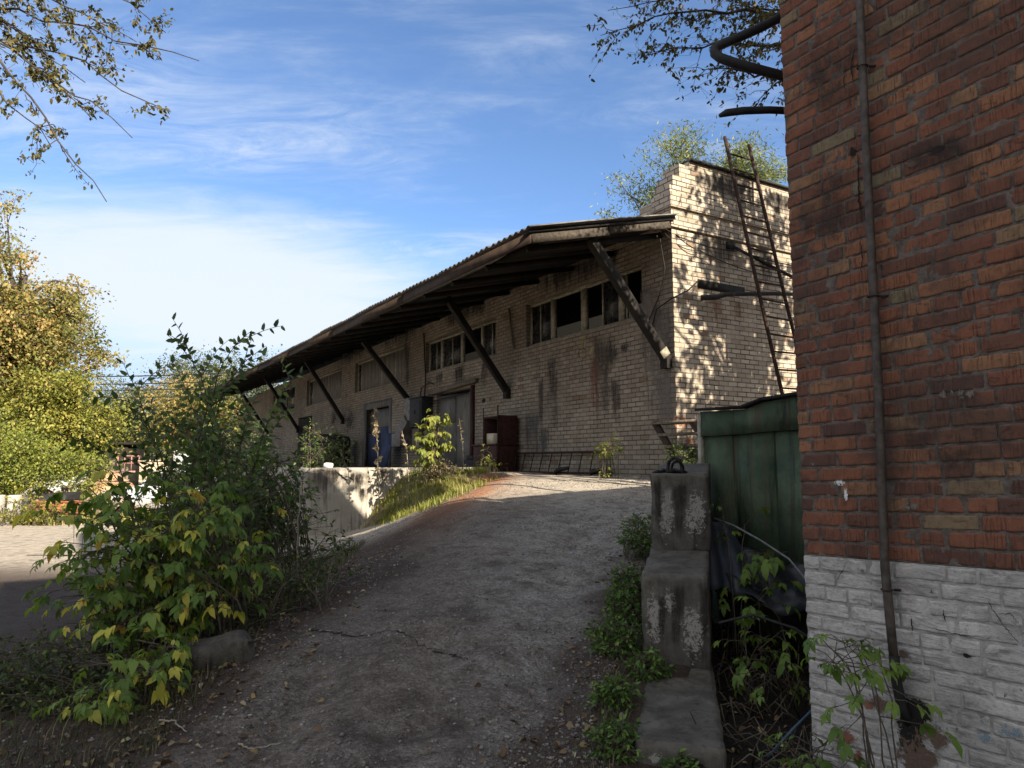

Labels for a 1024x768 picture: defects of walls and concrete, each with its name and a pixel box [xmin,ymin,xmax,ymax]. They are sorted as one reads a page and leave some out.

damp [582,335,628,413]
damp [658,587,684,641]
crack [311,629,468,659]